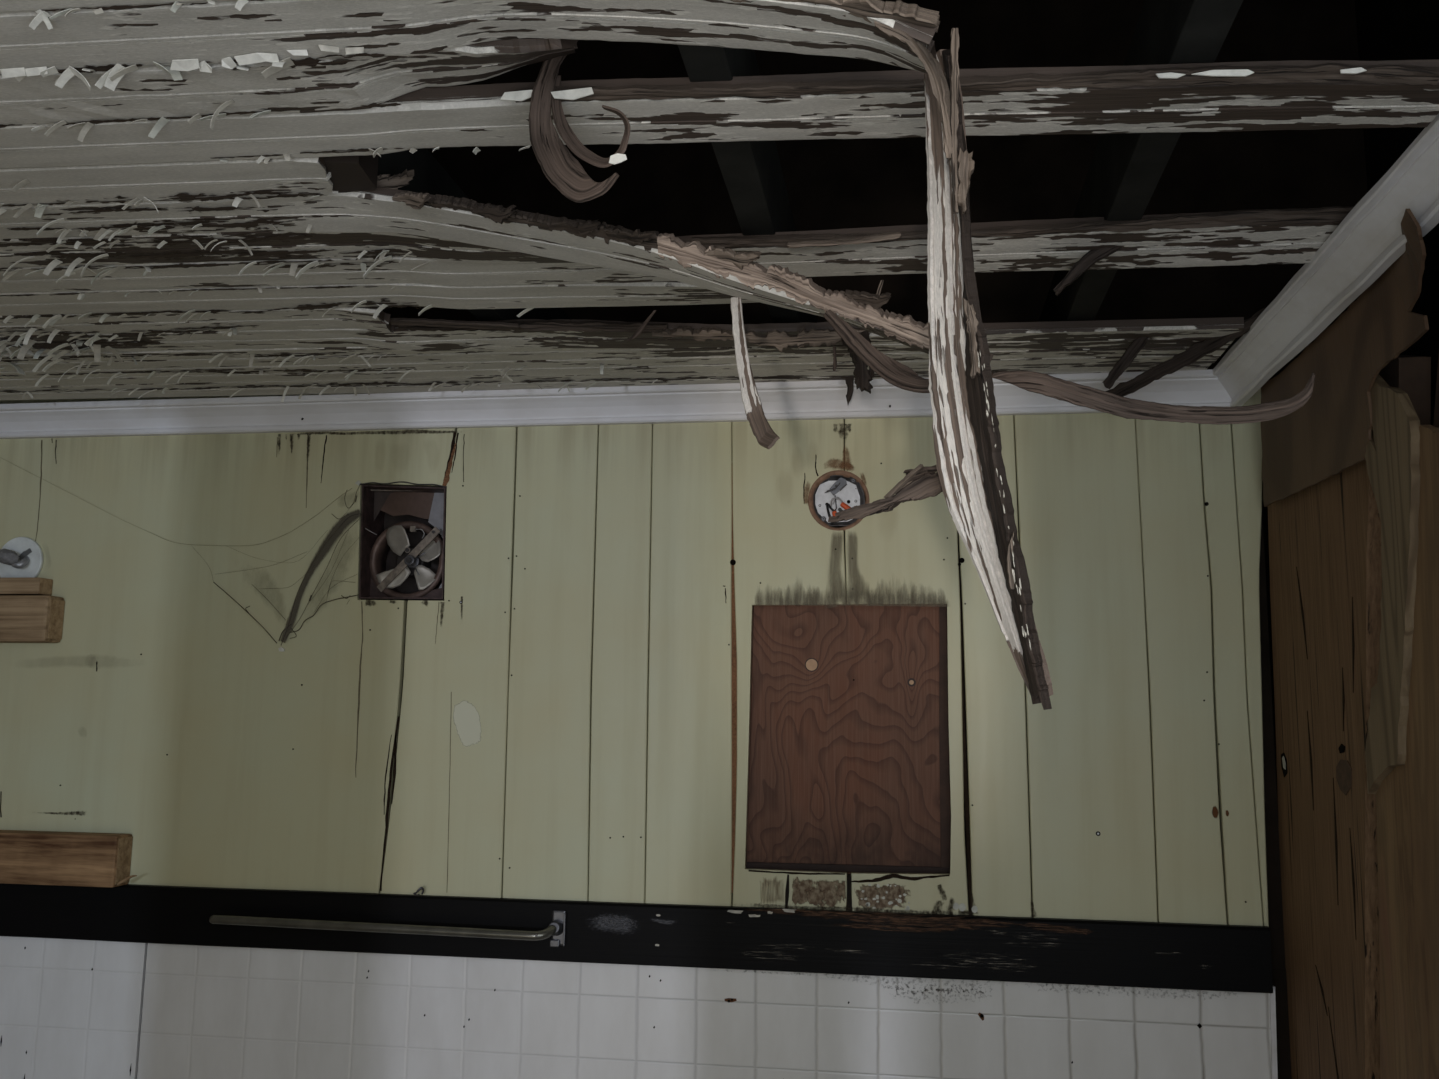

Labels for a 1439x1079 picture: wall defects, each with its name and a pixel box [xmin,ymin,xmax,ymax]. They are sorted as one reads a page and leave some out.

peeling [29,0,215,30]
peeling [234,0,264,11]
peeling [0,44,385,91]
peeling [0,99,300,142]
spalling [942,49,967,158]
peeling [211,147,440,164]
peeling [609,153,627,165]
peeling [0,179,855,402]
spalling [958,180,1052,710]
water stain [814,535,865,606]
crack [355,601,400,891]